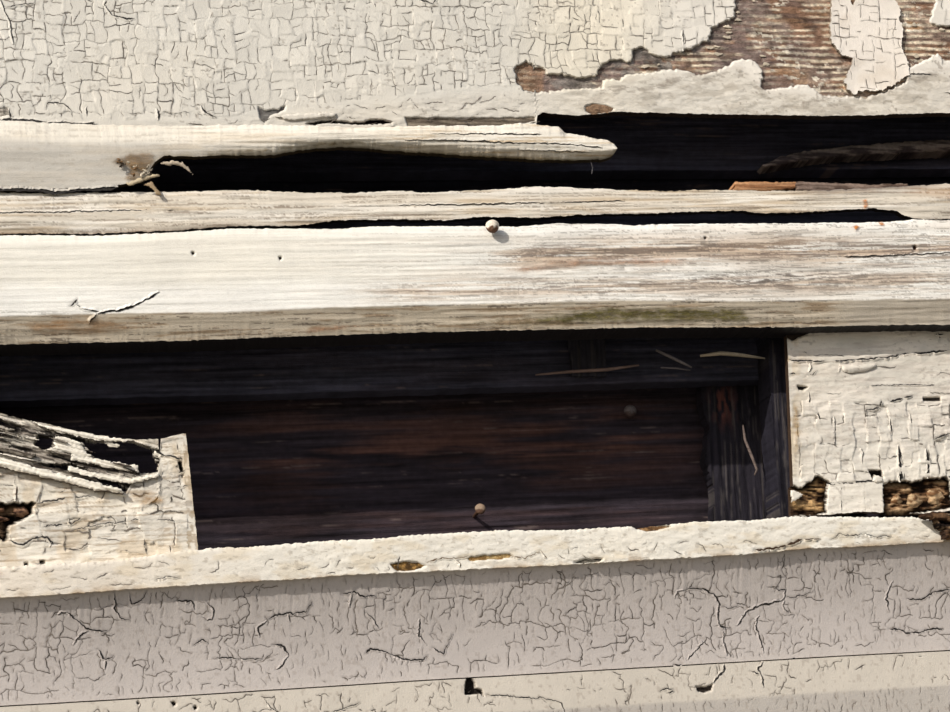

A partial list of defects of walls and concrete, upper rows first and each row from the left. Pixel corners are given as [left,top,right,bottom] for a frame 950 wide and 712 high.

crack [0,0,735,153]
peeling [585,104,613,115]
peeling [514,0,950,99]
crack [70,290,159,324]